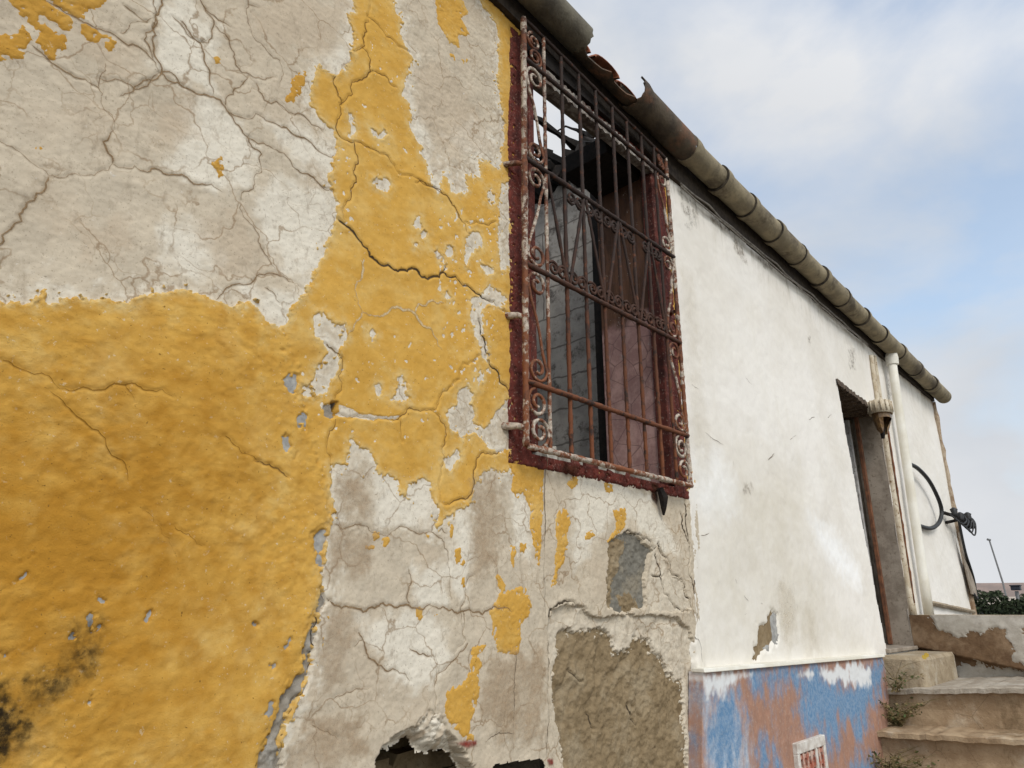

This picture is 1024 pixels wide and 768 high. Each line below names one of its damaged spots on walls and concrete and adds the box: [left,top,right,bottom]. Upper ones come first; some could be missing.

crack [0,173,85,245]
peeling [0,0,378,328]
crack [36,0,509,466]
peeling [372,178,390,192]
peeling [390,0,510,194]
crack [274,451,510,766]
peeling [257,182,700,768]
crack [487,655,517,749]
crack [544,460,576,618]
crack [625,503,709,652]
peeling [752,610,779,661]